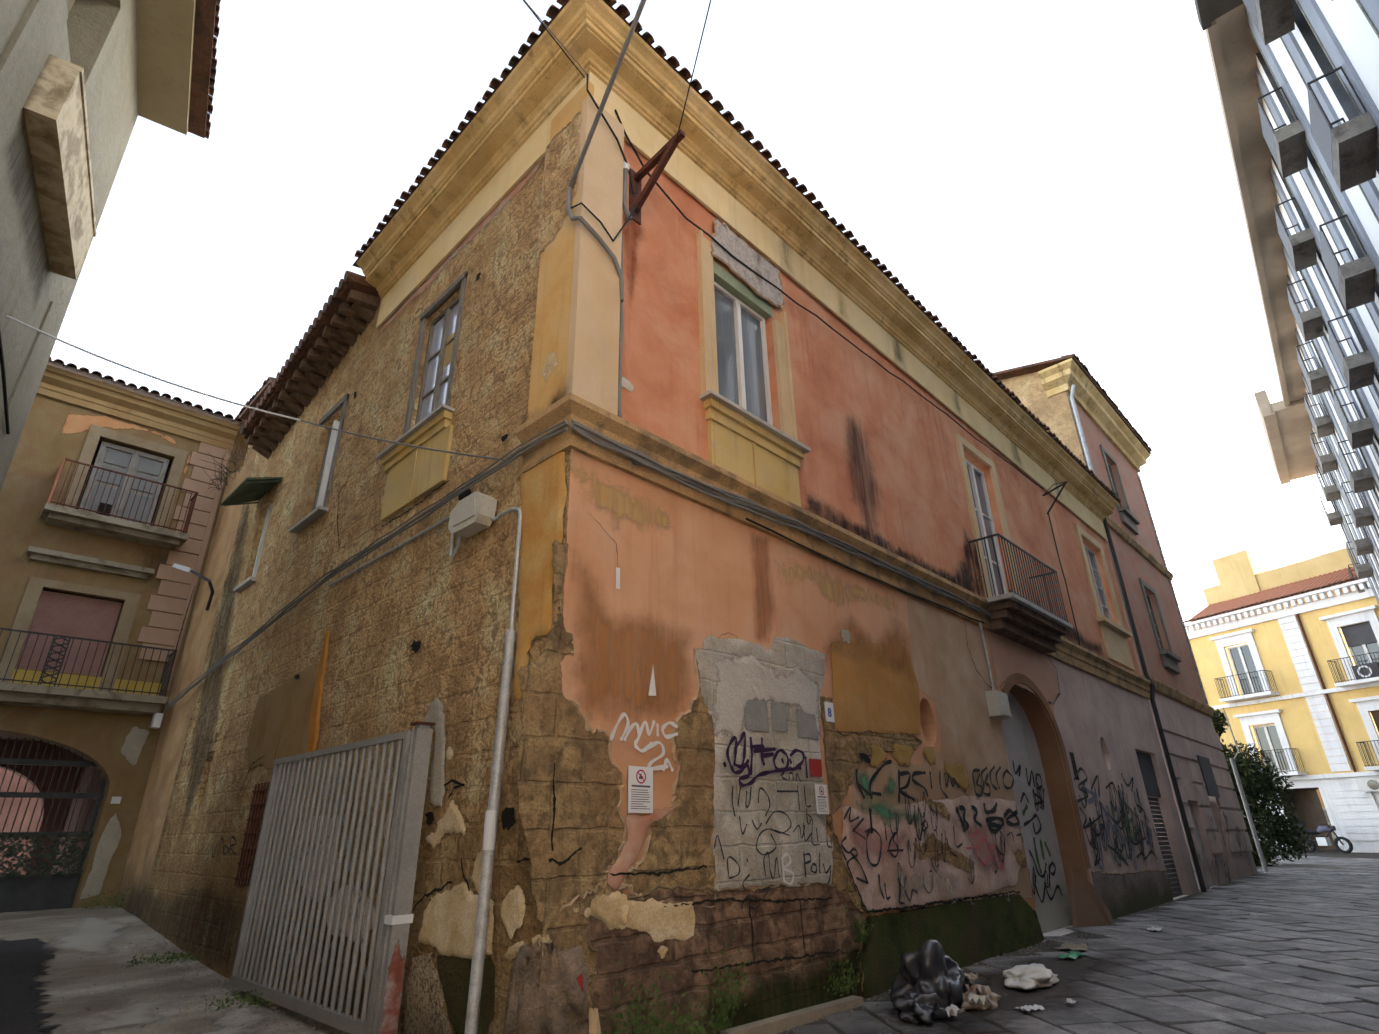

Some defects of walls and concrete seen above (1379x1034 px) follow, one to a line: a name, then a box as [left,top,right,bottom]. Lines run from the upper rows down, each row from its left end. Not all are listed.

damp [809,422,986,597]
damp [188,508,248,804]
damp [1063,628,1103,655]
flaking render [120,726,150,766]
flaking render [403,540,974,1034]
flaking render [79,813,122,900]
damp [128,893,347,1002]
corrosion [379,940,406,1034]